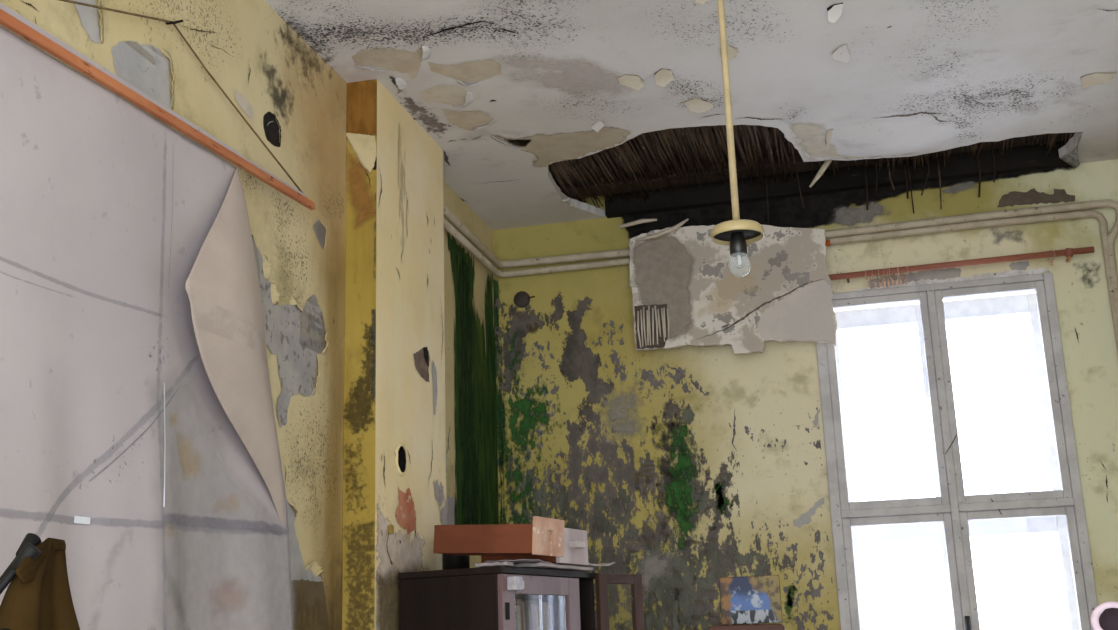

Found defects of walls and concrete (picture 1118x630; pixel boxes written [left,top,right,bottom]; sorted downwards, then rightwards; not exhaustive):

peeling [352,46,531,150]
water stain [496,81,639,167]
water stain [645,0,786,46]
peeling [827,3,844,23]
crack [874,112,947,122]
water stain [896,0,1075,142]
flaking render [997,188,1075,207]
peeling [256,246,328,428]
crack [698,279,823,339]
water stain [327,309,376,630]
peeling [494,291,834,630]
flaking render [376,486,425,583]